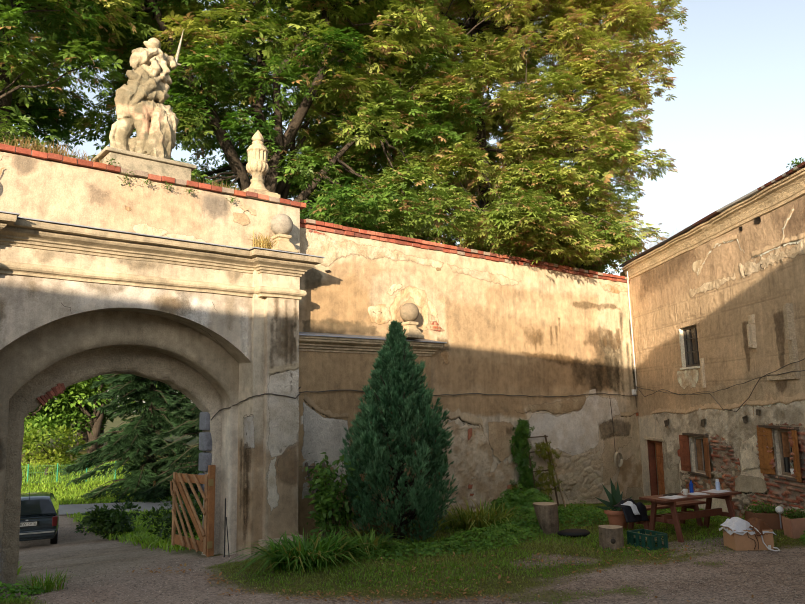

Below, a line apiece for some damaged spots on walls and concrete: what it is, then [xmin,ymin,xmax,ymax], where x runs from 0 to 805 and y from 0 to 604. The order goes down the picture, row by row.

spalling [305,229,444,271]
spalling [689,204,805,298]
spalling [368,304,392,325]
flaking render [265,363,350,511]
spalling [436,418,518,511]
flaking render [651,393,805,519]